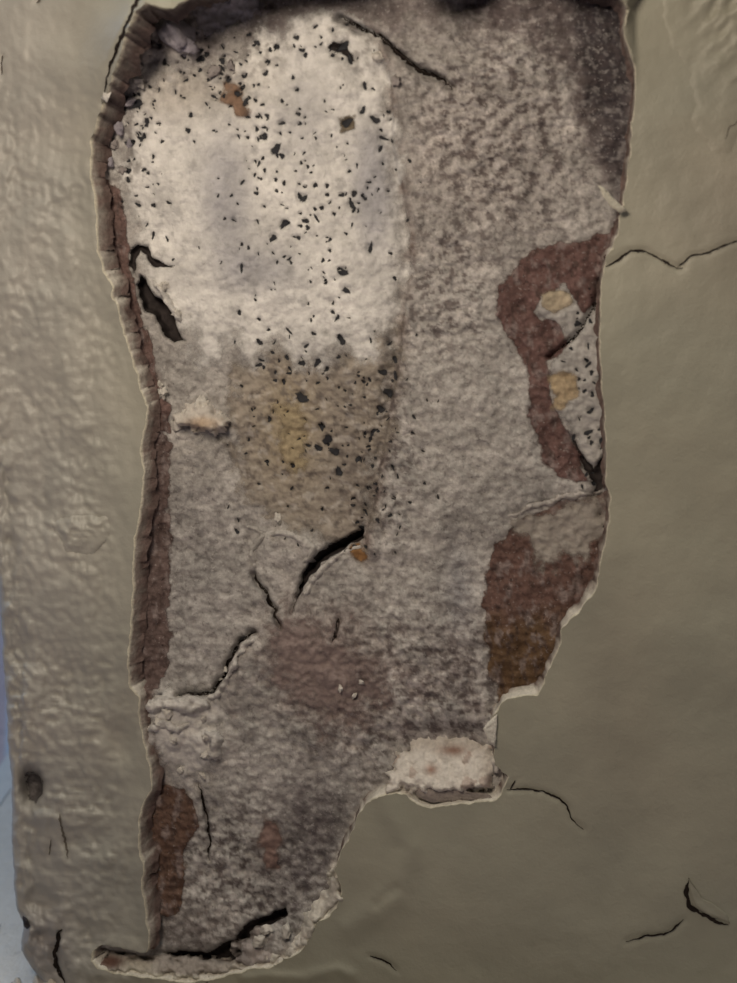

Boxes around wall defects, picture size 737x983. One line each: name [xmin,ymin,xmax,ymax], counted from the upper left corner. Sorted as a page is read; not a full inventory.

crack [101,0,139,100]
crack [605,241,737,269]
flaking render [90,0,636,983]
crack [507,781,583,829]
crack [626,919,684,942]